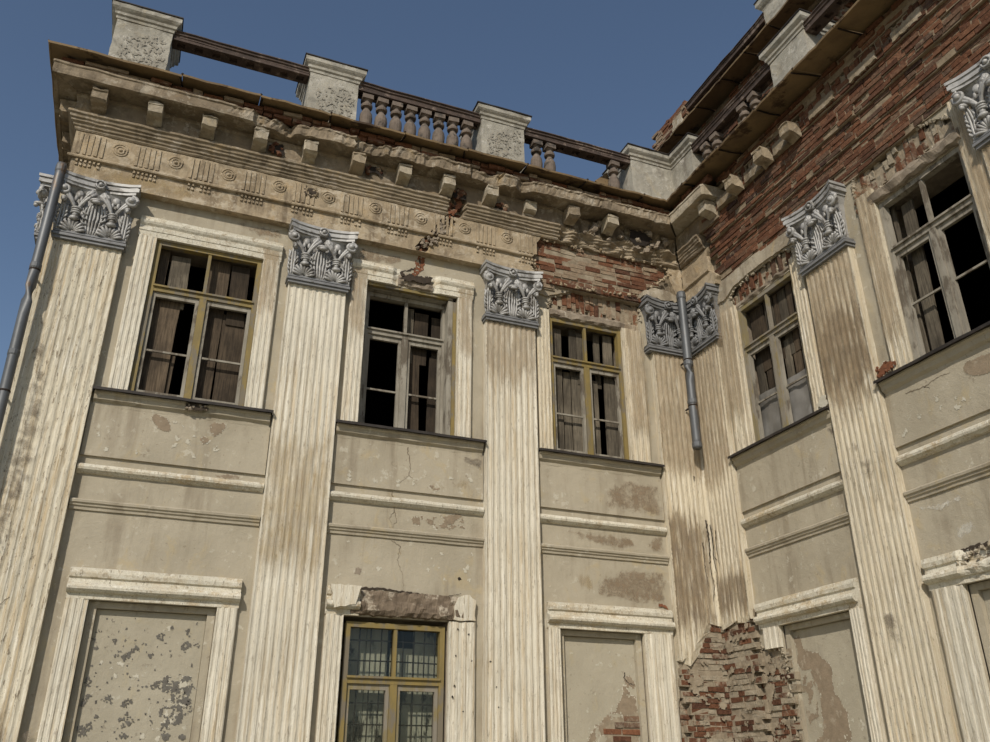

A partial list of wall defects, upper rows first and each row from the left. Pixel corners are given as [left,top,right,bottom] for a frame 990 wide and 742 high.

flaking render [530,221,677,338]
water stain [815,303,871,397]
peeling [151,414,227,451]
water stain [609,482,657,513]
spalling [350,590,463,622]
water stain [587,534,633,547]
water stain [599,572,662,602]
water stain [652,513,747,628]
crack [702,520,720,602]
peeling [76,618,200,742]
peeling [587,672,640,742]
flaking render [677,609,870,742]